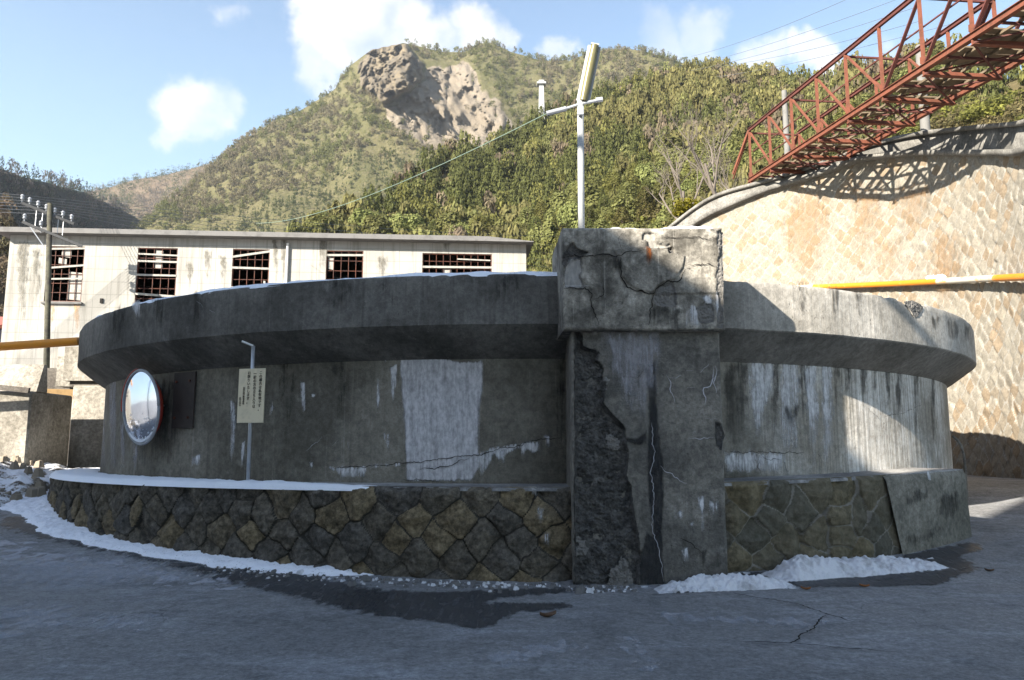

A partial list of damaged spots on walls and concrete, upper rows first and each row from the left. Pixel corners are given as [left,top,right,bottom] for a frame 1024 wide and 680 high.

crack [564,231,717,324]
spalling [904,300,923,317]
leakage [725,363,901,445]
crack [314,438,556,482]
spalling [574,332,641,586]
leakage [608,333,665,585]
crack [630,427,703,575]
efflorescence [725,452,782,471]